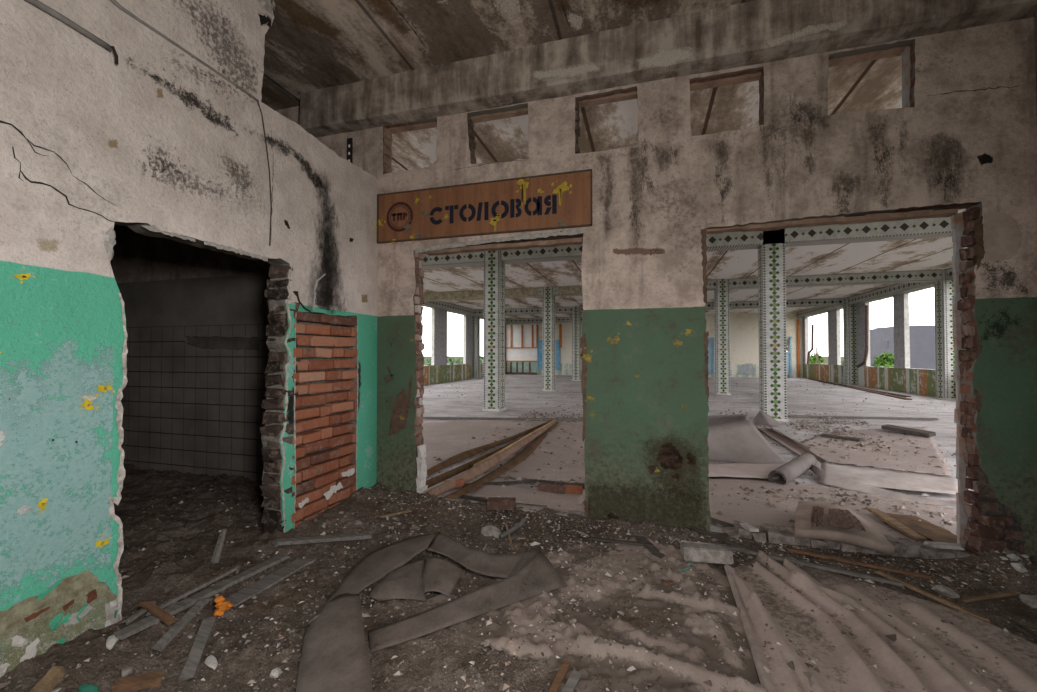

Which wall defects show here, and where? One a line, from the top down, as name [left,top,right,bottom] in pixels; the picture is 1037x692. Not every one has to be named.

water stain [164,0,263,107]
crack [0,120,118,222]
water stain [138,136,261,212]
spalling [974,216,985,269]
peeling [0,293,128,678]